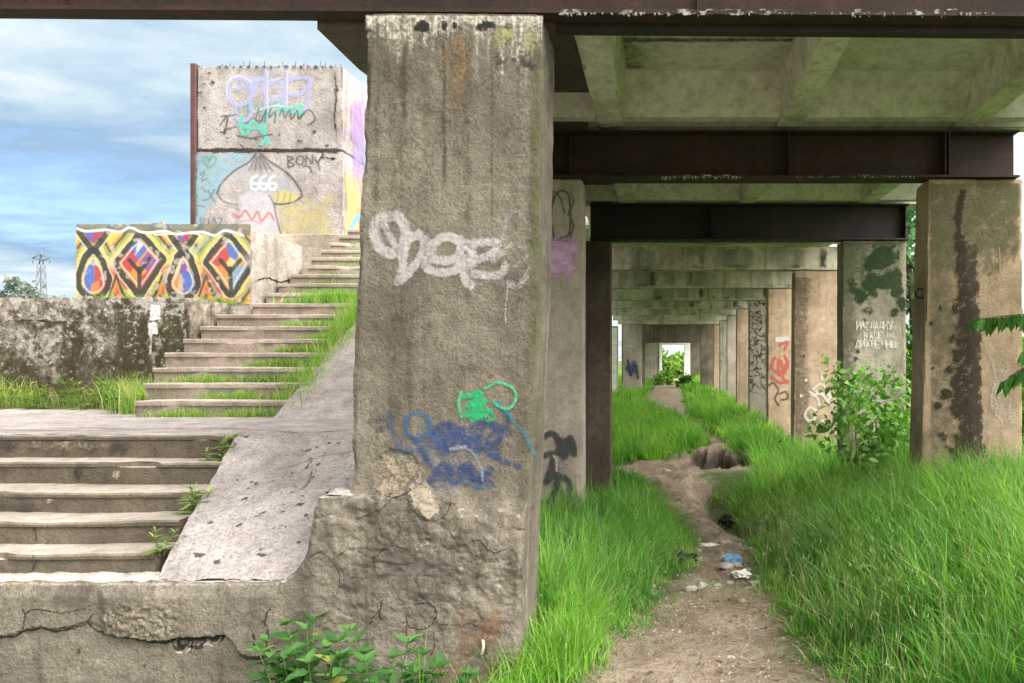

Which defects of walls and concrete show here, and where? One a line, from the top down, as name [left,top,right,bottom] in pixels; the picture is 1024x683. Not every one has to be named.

leakage [366,15,543,383]
leakage [0,296,186,384]
leakage [843,242,906,454]
leakage [930,182,1020,469]
crack [0,605,272,660]
peeling [375,453,441,520]
crack [308,475,509,655]